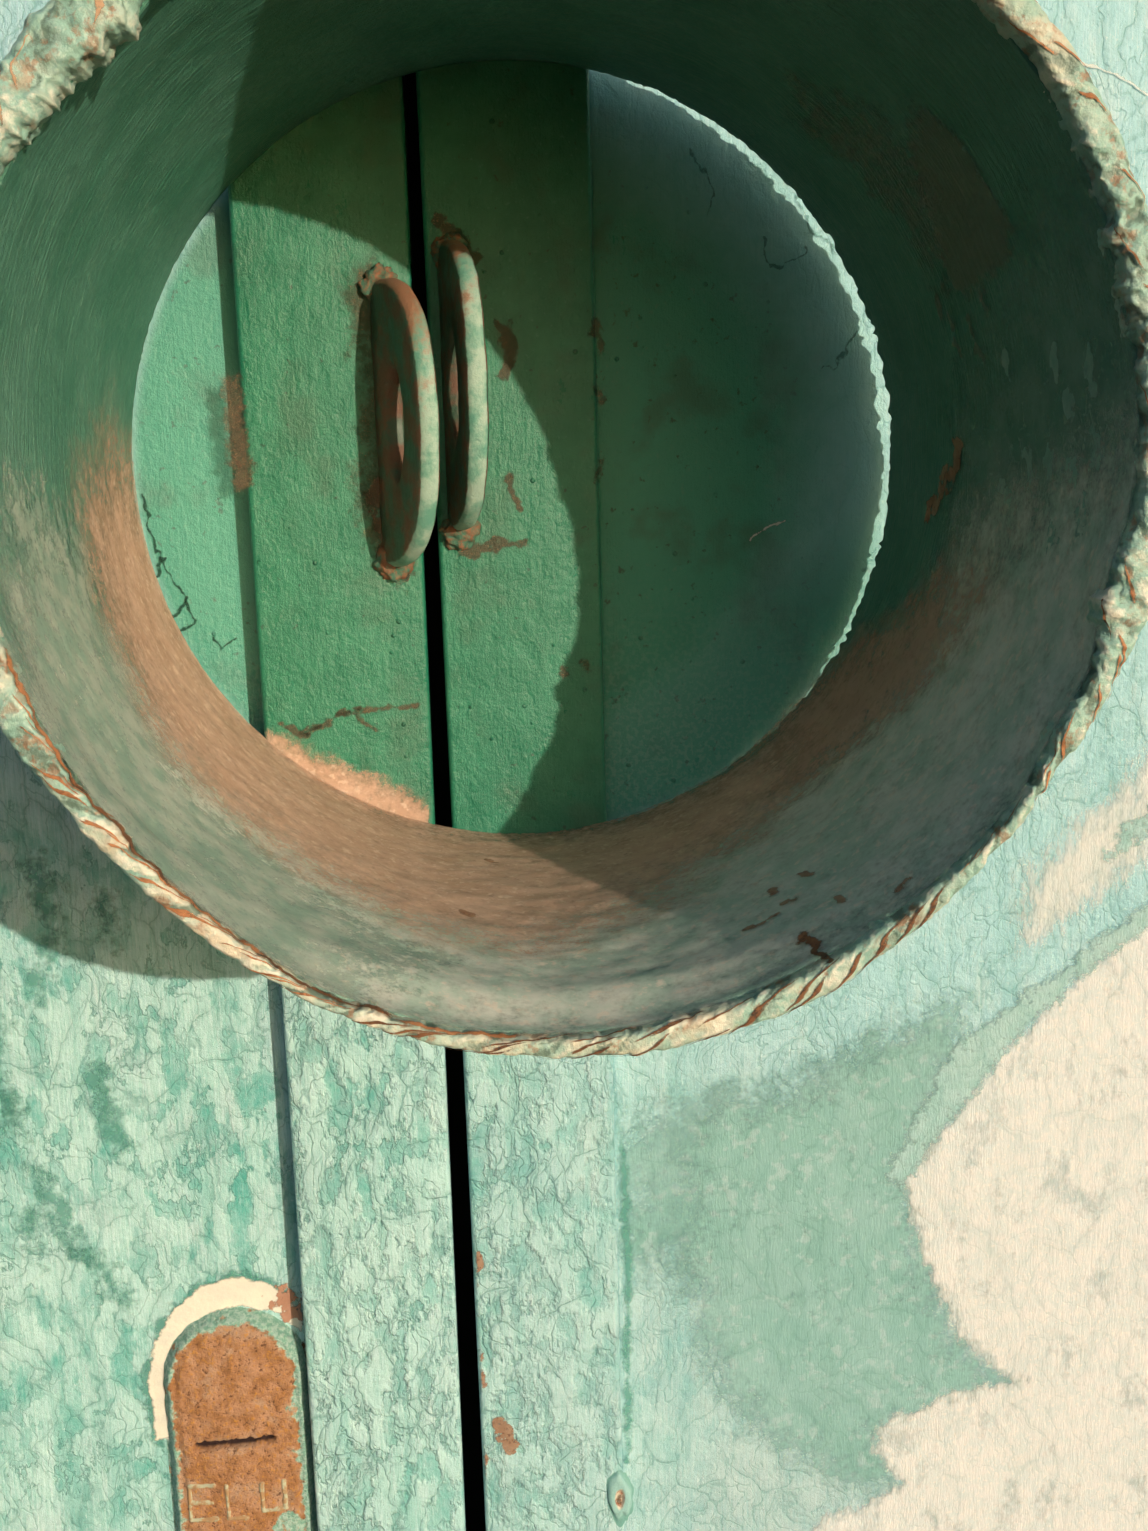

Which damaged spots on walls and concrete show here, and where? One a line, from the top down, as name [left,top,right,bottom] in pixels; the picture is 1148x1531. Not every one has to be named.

corrosion [94,0,104,23]
corrosion [1008,21,1107,112]
corrosion [431,213,482,265]
corrosion [493,319,518,380]
corrosion [221,375,256,491]
crack [142,494,237,649]
corrosion [77,435,987,955]
corrosion [1093,599,1127,722]
corrosion [961,710,1076,872]
corrosion [4,647,946,1059]
peeling [141,1269,303,1446]
corrosion [485,1417,520,1465]